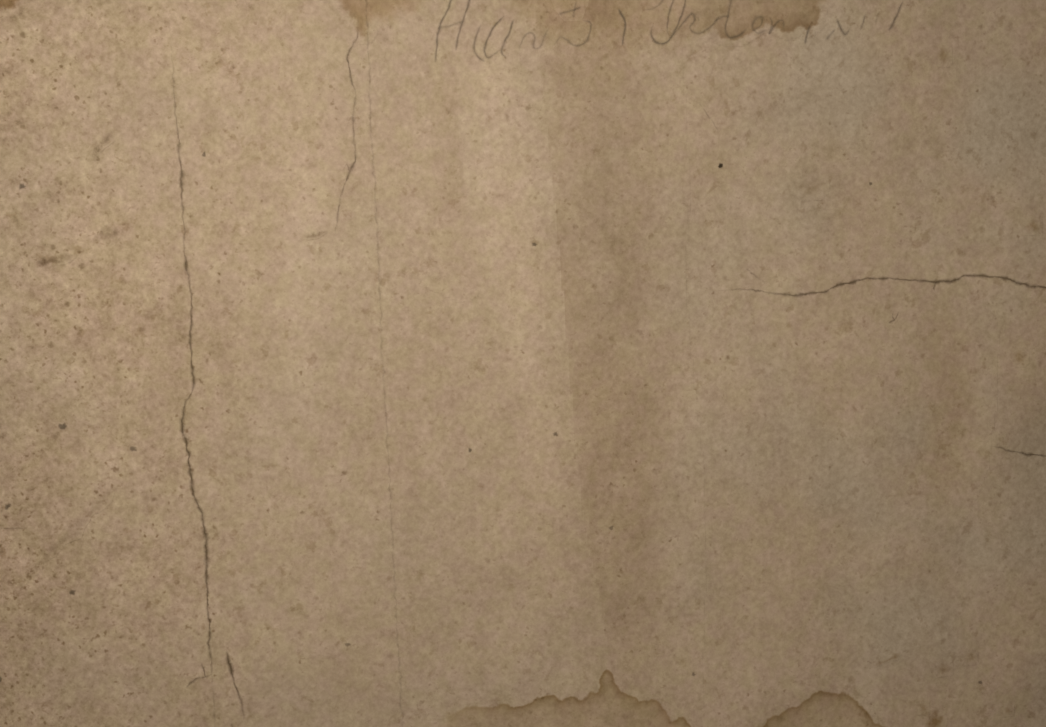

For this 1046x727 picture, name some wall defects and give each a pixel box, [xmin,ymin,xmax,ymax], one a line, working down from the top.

damp [303,0,445,44]
damp [411,0,845,727]
damp [896,279,1000,530]
crack [181,418,237,689]
damp [748,684,899,727]